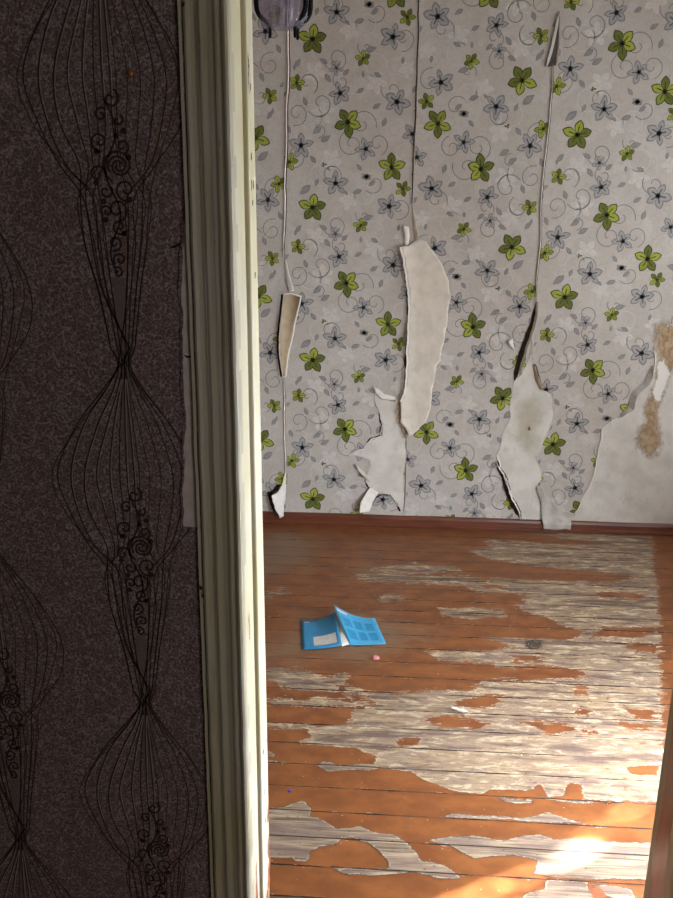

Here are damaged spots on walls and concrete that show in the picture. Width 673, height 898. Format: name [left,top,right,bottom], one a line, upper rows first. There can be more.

peeling [352,206,451,512]
flaking render [497,321,554,520]
flaking render [571,324,673,524]
peeling [317,761,379,772]
peeling [256,801,461,898]
peeling [443,812,582,823]
peeling [499,796,533,804]
peeling [429,834,651,898]